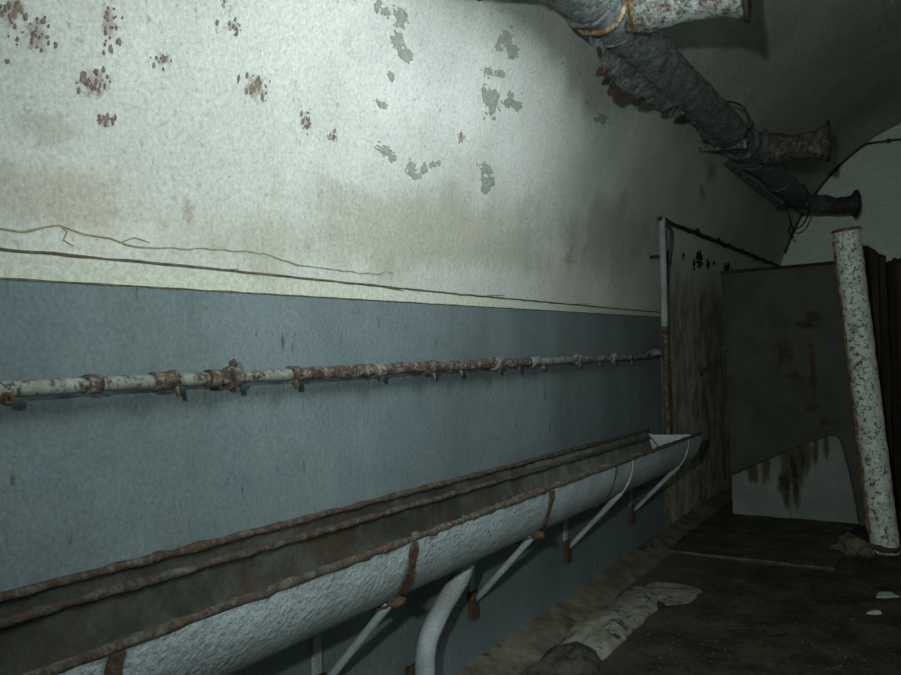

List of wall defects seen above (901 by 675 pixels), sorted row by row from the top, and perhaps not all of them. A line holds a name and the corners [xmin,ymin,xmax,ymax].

corrosion [0,0,58,53]
corrosion [75,6,123,94]
peeling [374,0,413,64]
peeling [495,25,520,59]
corrosion [237,72,271,102]
peeling [480,66,523,120]
corrosion [97,112,117,127]
peeling [374,141,397,163]
peeling [405,158,441,180]
peeling [477,161,495,194]
crack [0,224,661,317]